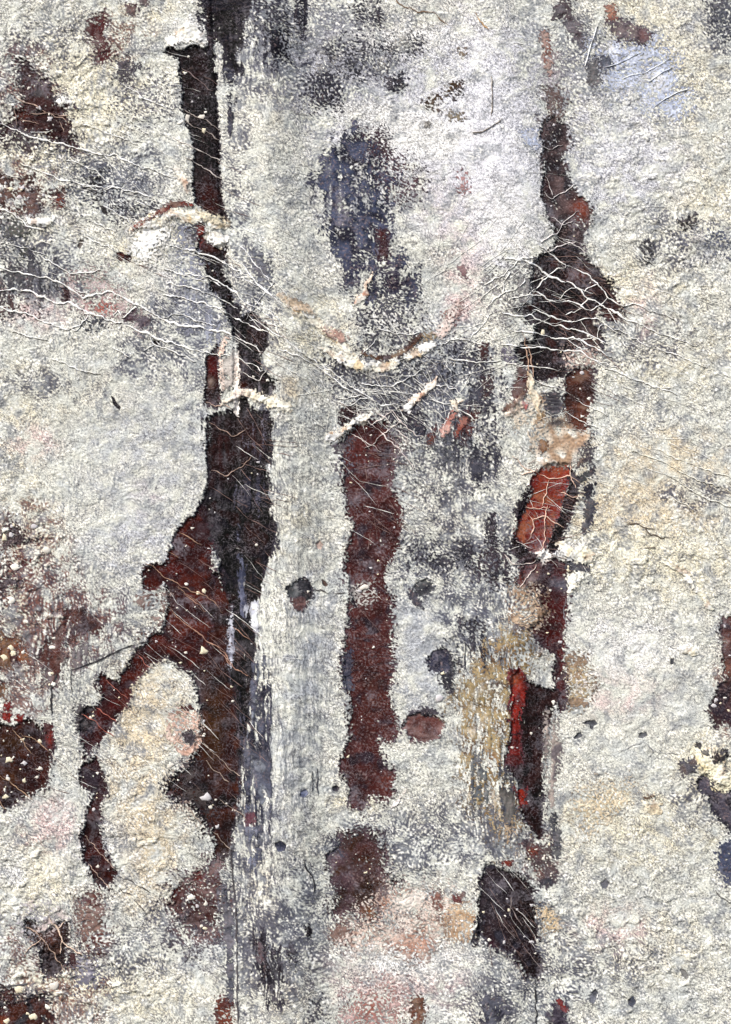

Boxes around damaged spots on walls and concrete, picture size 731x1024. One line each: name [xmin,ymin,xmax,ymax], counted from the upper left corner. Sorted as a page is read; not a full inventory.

corrosion [0,509,245,1024]
crack [0,402,308,1023]
water stain [193,0,510,504]
crack [313,582,404,637]
crack [0,49,731,587]
corrosion [322,415,480,1024]
corrosion [510,364,534,402]
corrosion [561,362,599,535]